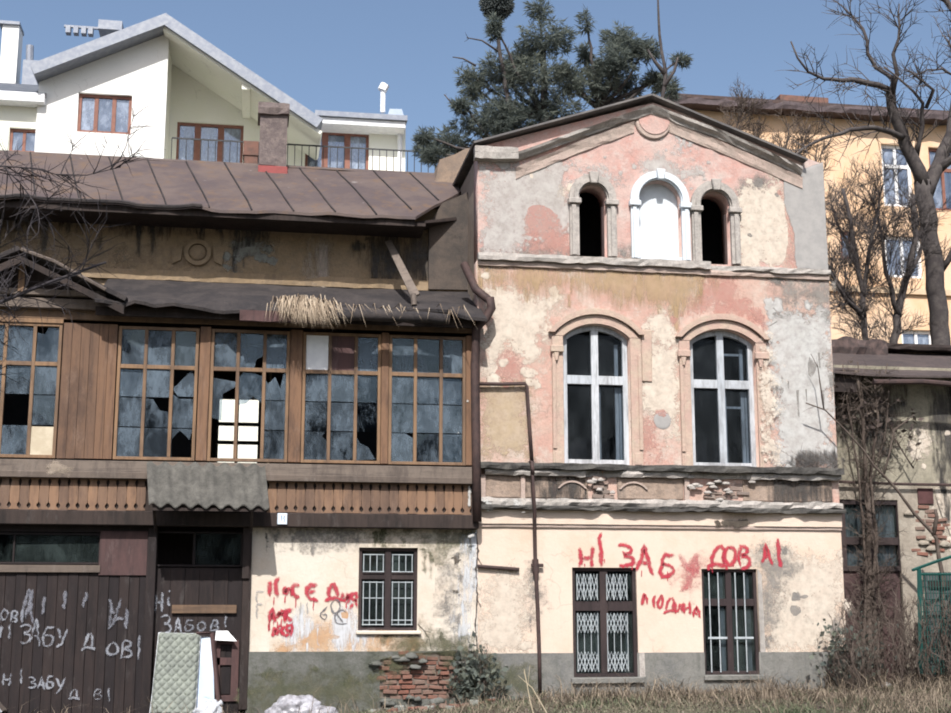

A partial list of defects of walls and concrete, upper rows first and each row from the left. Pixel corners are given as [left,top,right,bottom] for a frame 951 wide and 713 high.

peeling [478,151,587,254]
peeling [480,266,567,389]
peeling [640,175,837,468]
leakage [929,386,951,522]
flaking render [904,479,951,556]
peeling [452,555,534,660]
flaking render [368,649,466,711]